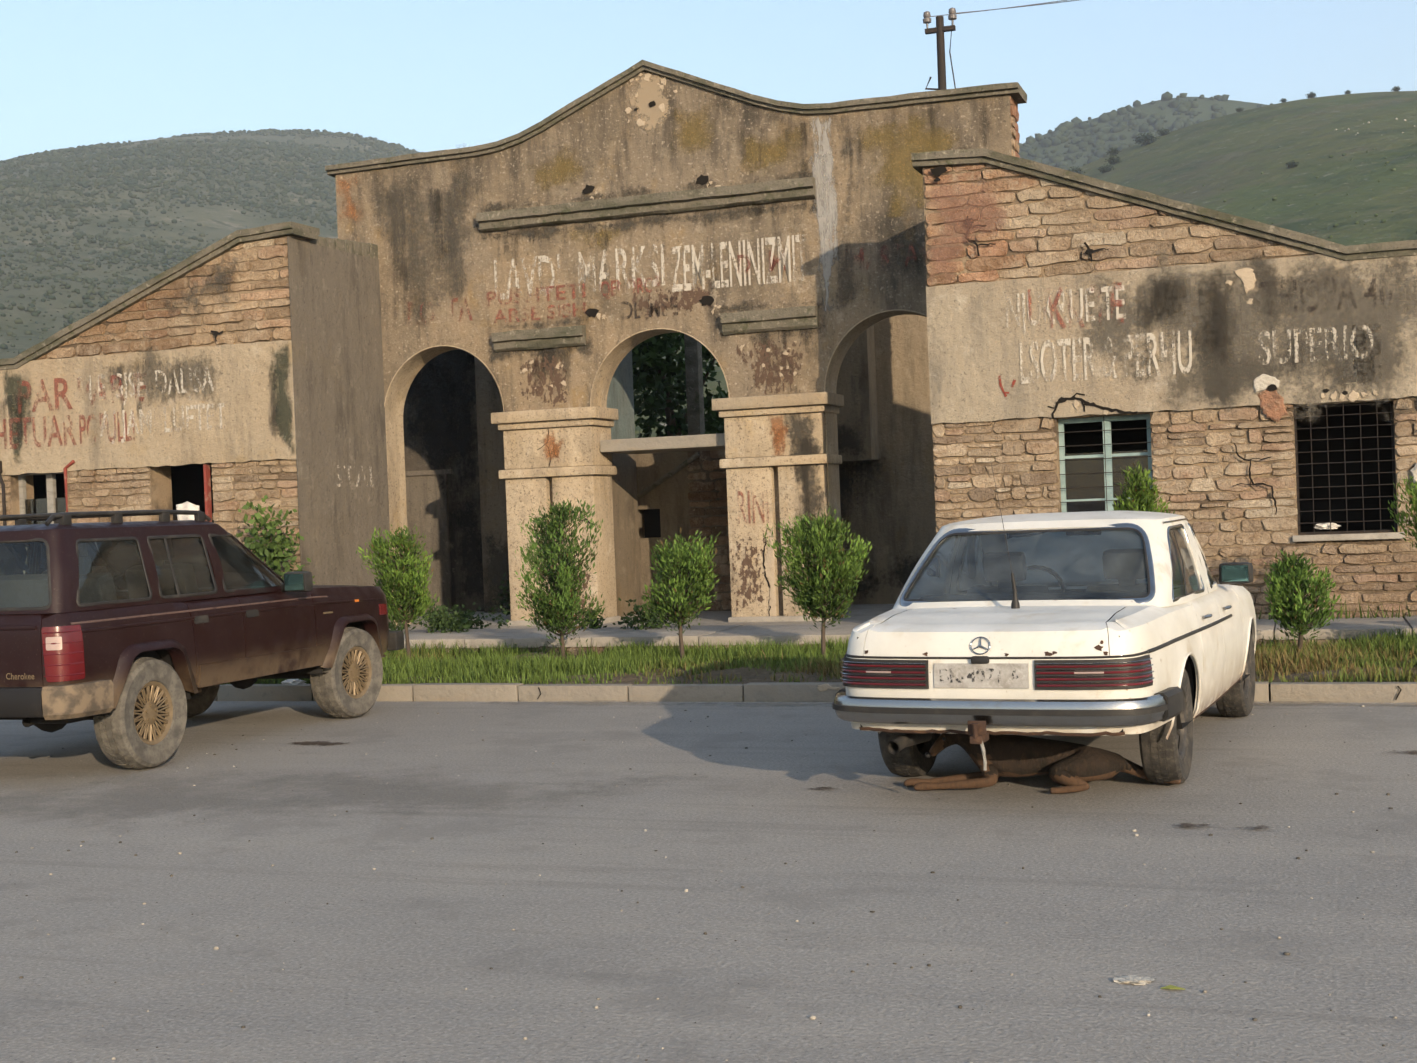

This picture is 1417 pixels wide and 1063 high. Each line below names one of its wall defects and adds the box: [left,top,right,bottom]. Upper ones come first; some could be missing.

spalling [625,73,677,131]
leakage [1085,253,1417,418]
leakage [4,373,31,459]
leakage [270,347,294,453]
crack [1048,393,1138,419]
spalling [1252,374,1288,422]
flaking render [687,450,777,616]